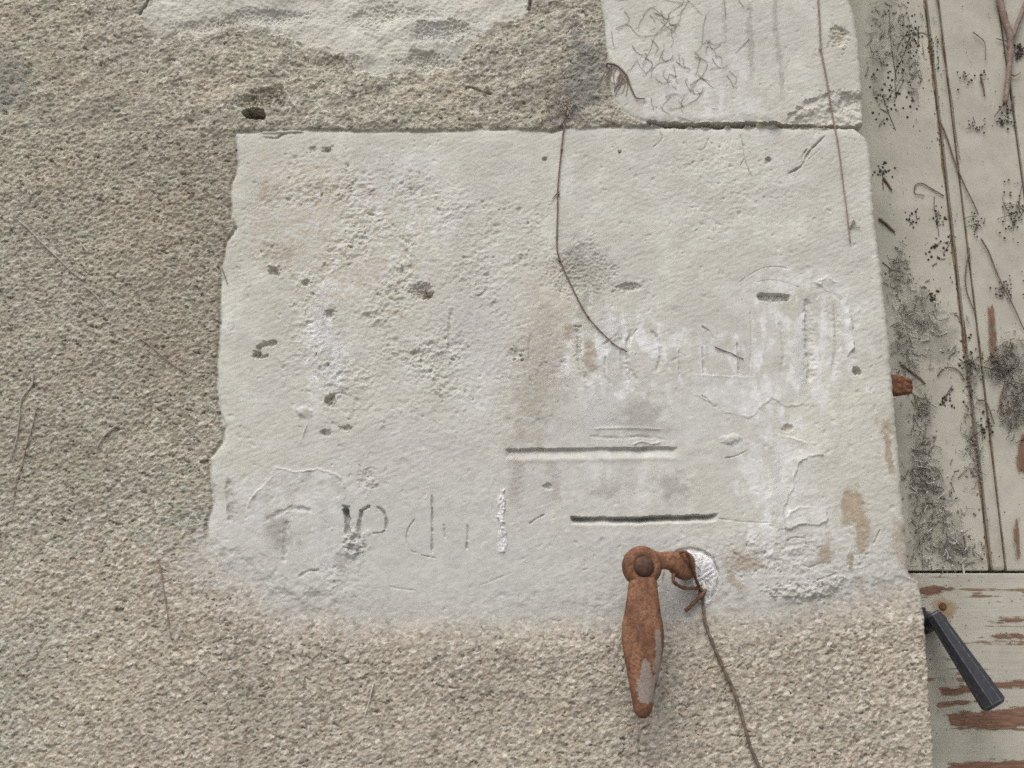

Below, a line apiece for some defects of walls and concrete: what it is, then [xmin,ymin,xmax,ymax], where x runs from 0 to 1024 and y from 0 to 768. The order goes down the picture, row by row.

crack [724,449,749,460]
rust [841,491,869,569]